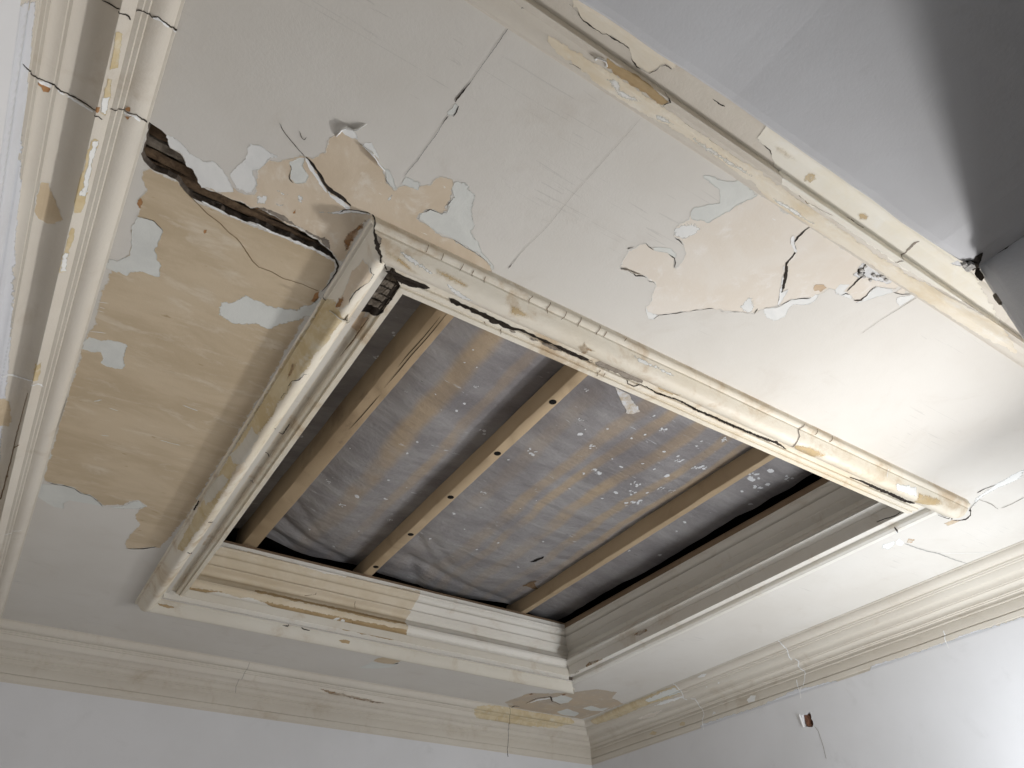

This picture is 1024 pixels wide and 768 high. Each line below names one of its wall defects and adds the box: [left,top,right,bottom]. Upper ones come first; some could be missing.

crack [23,64,147,123]
crack [405,7,524,175]
crack [279,123,387,270]
peeling [548,0,1017,354]
crack [191,197,326,301]
crack [778,201,864,305]
peeling [34,124,494,551]
crack [854,286,916,333]
crack [938,469,1024,521]
peeling [474,686,681,728]